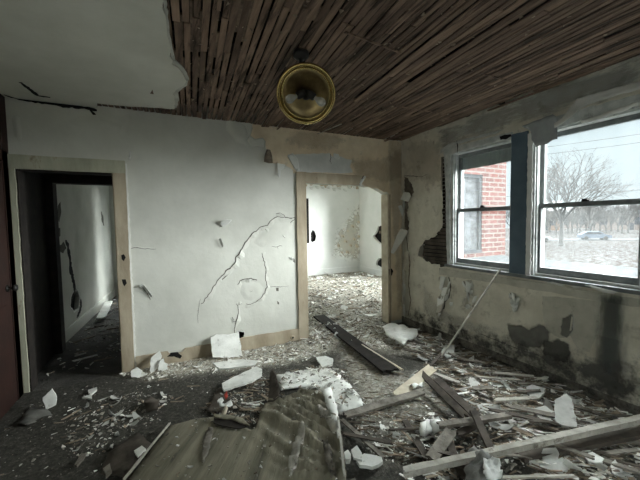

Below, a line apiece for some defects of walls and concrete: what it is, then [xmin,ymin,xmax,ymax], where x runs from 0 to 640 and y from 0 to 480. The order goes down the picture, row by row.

crack [19,82,50,98]
spalling [97,0,640,394]
crack [197,213,297,333]
damp [410,296,640,405]
peeling [619,381,640,406]